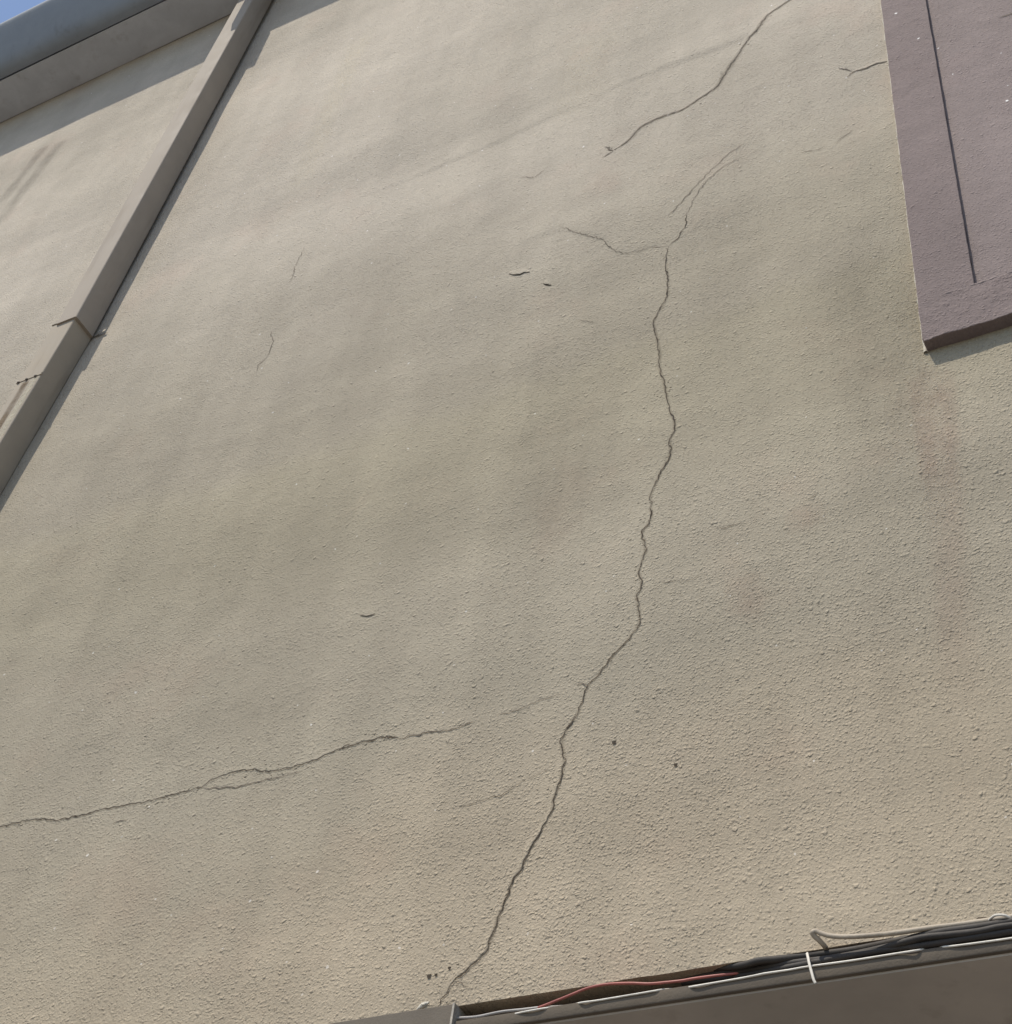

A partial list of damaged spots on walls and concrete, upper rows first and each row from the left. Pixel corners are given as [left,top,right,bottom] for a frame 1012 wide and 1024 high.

crack [604,0,789,156]
crack [839,59,887,77]
crack [428,149,737,1006]
crack [0,721,474,827]